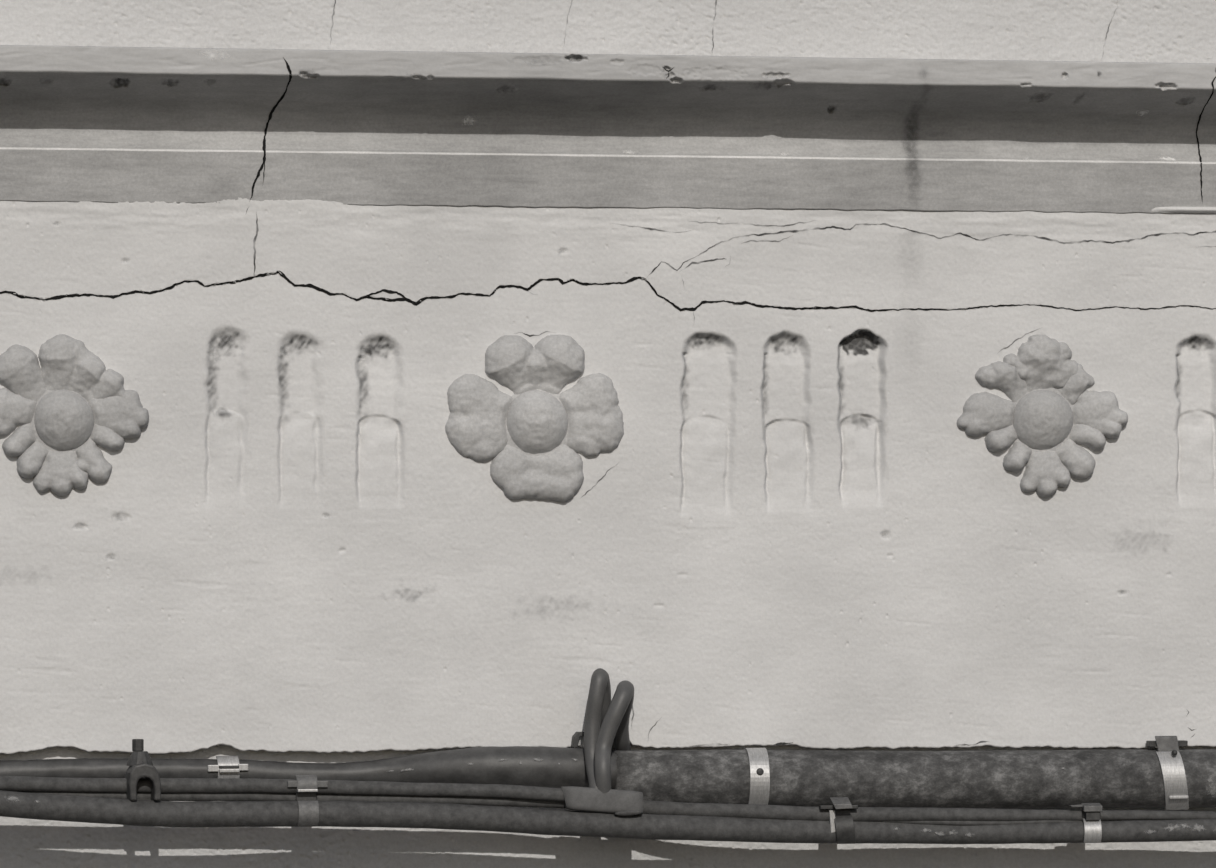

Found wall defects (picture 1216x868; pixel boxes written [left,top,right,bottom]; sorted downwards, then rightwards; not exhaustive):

crack [0,59,1216,312]